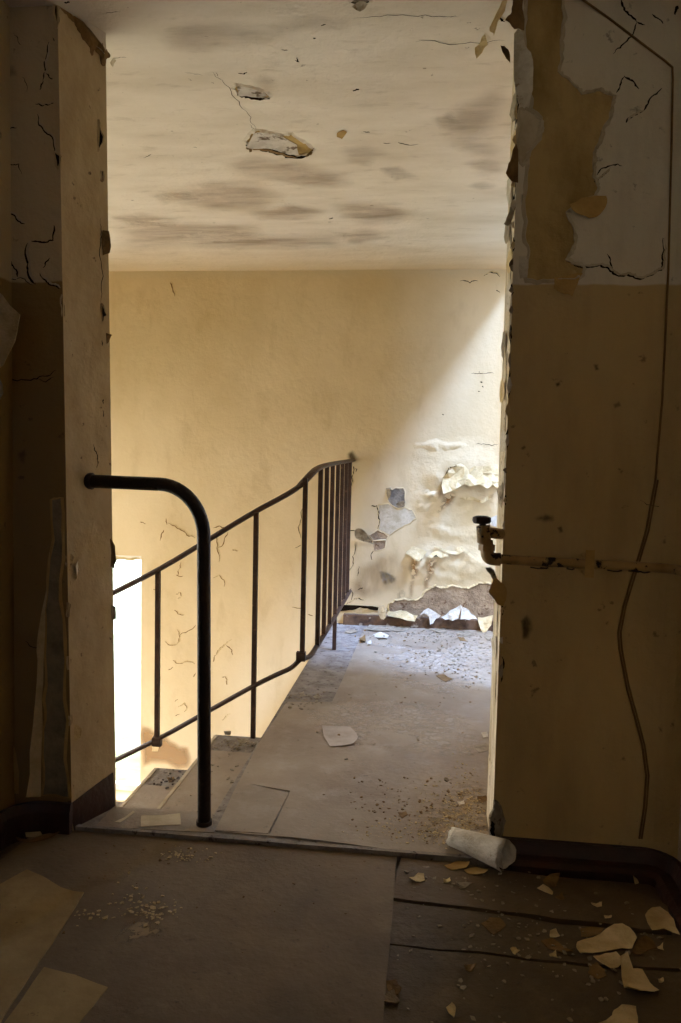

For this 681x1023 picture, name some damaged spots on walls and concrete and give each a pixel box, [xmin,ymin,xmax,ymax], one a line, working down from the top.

crack [613,0,679,54]
spalling [231,83,273,101]
crack [616,76,662,123]
spalling [243,128,315,159]
crack [11,211,61,289]
peeling [442,0,617,529]
crack [573,236,667,280]
peeling [355,486,417,552]
crack [141,520,239,586]
peeling [406,546,476,561]
crack [154,562,233,685]
peeling [341,605,412,638]